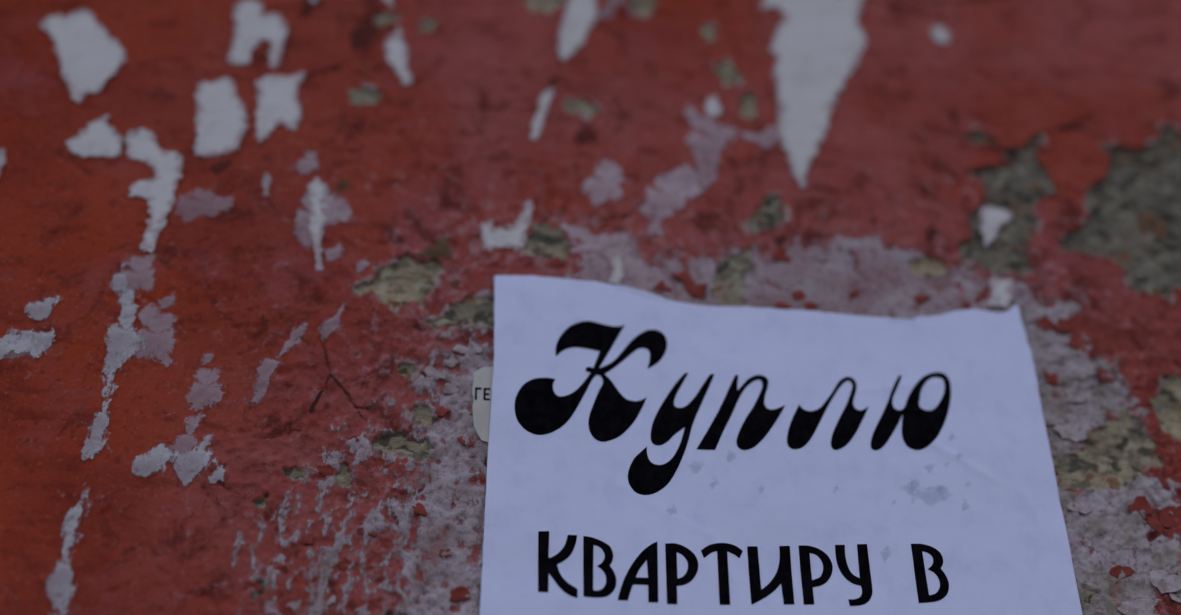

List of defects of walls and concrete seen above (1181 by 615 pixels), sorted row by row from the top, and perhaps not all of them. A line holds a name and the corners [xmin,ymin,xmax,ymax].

spalling [714,62,758,122]
peeling [231,289,495,615]
spalling [355,255,442,311]
peeling [622,128,1181,615]